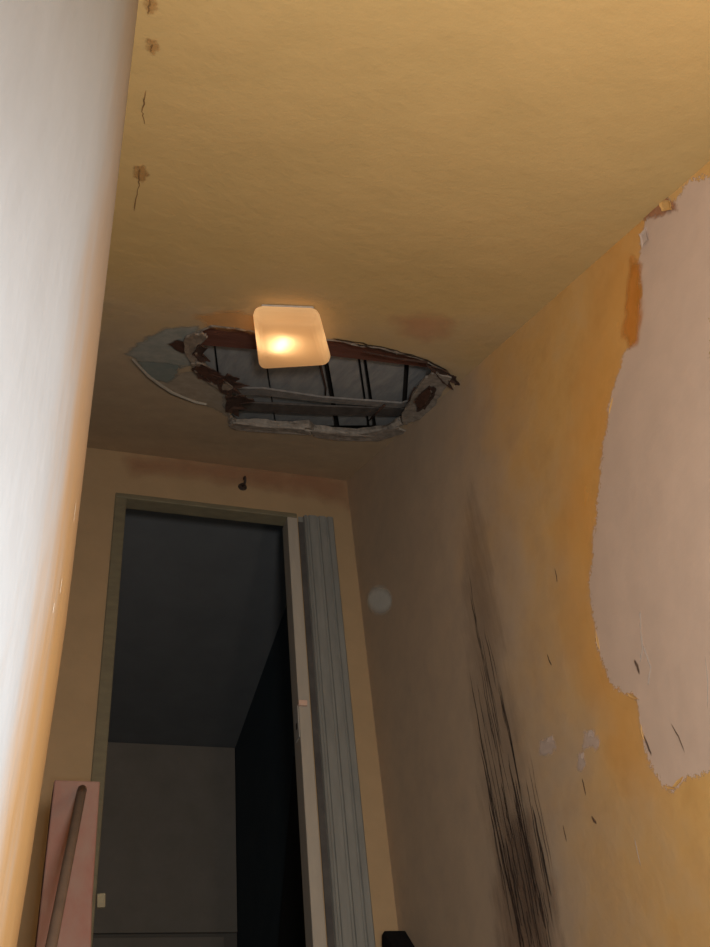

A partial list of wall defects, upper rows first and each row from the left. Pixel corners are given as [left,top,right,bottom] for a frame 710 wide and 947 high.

flaking render [127,325,460,442]
peeling [589,175,710,793]
water stain [472,635,552,947]